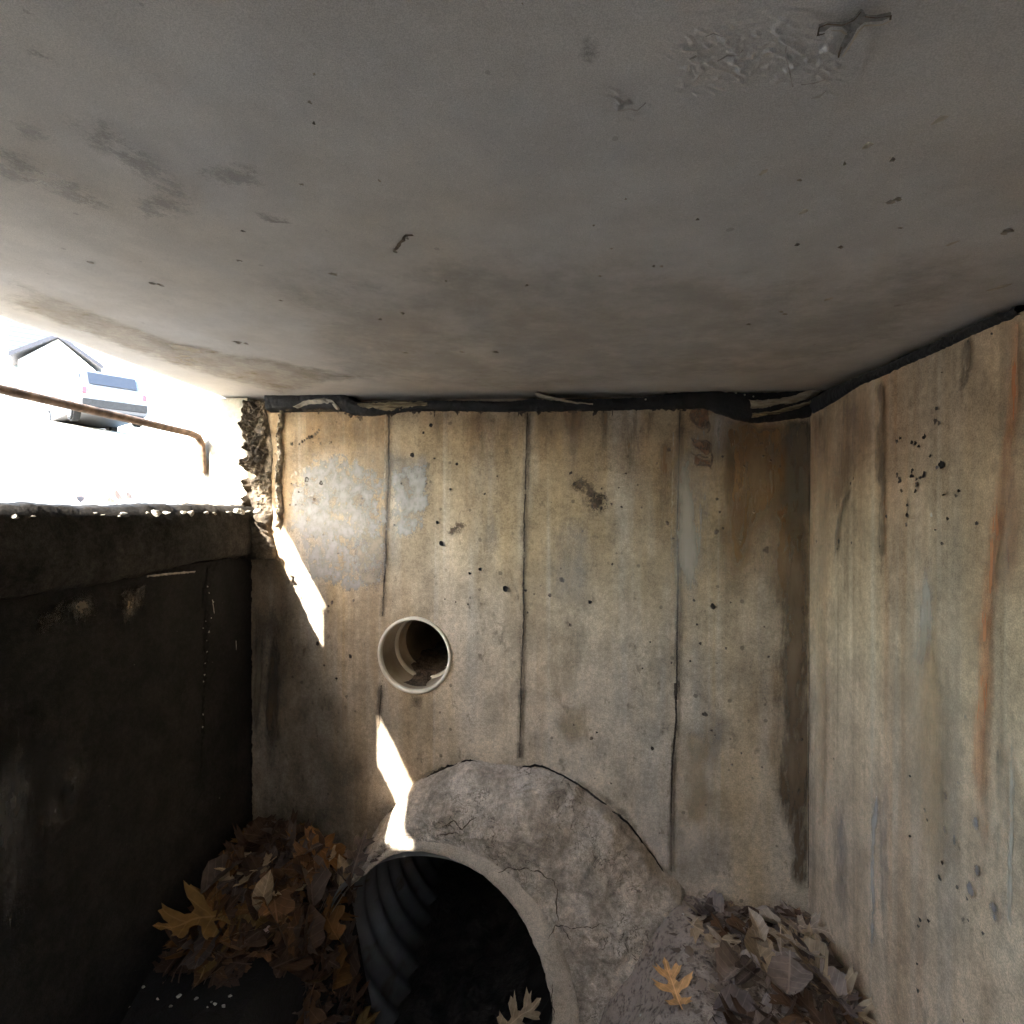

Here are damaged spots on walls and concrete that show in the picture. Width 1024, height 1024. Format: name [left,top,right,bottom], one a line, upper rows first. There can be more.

crack [518,409,683,872]
water stain [724,421,811,884]
crack [427,759,478,777]
crack [437,817,476,836]
crack [498,867,599,945]